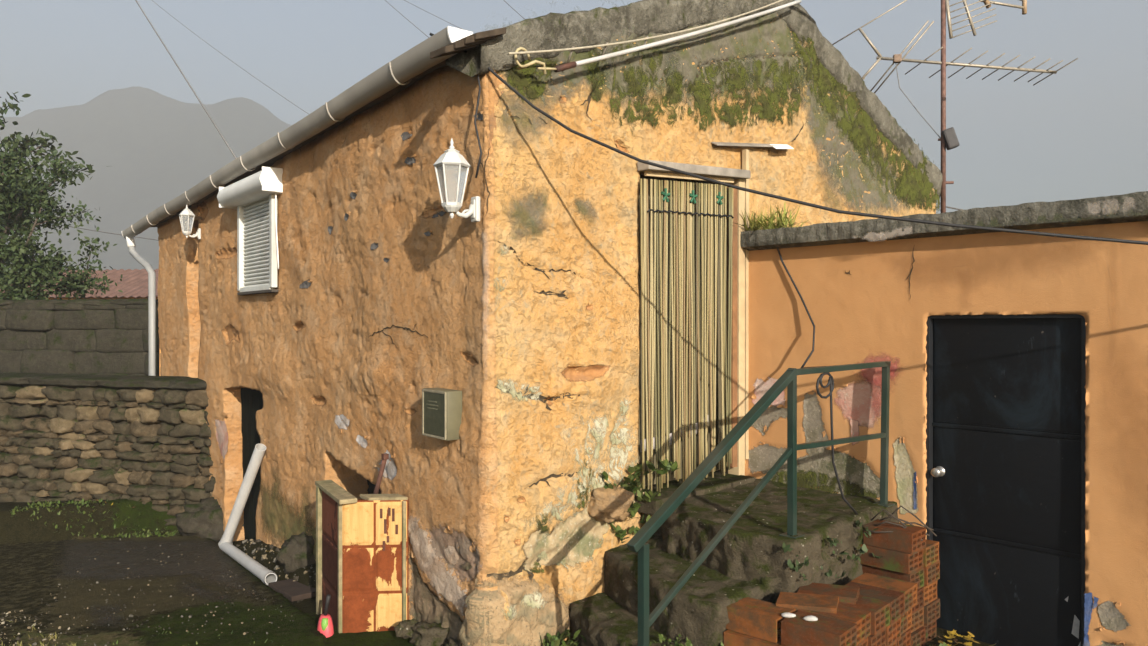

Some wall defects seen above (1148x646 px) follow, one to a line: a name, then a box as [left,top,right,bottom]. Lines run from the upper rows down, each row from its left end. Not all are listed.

damp [498,5,909,215]
damp [511,194,546,232]
damp [865,228,911,240]
crack [905,245,915,300]
crack [370,324,432,348]
flaking render [748,377,881,500]
peeling [893,437,919,515]
flaking render [407,514,482,646]
peeling [1072,615,1081,646]
peeling [1098,601,1131,646]